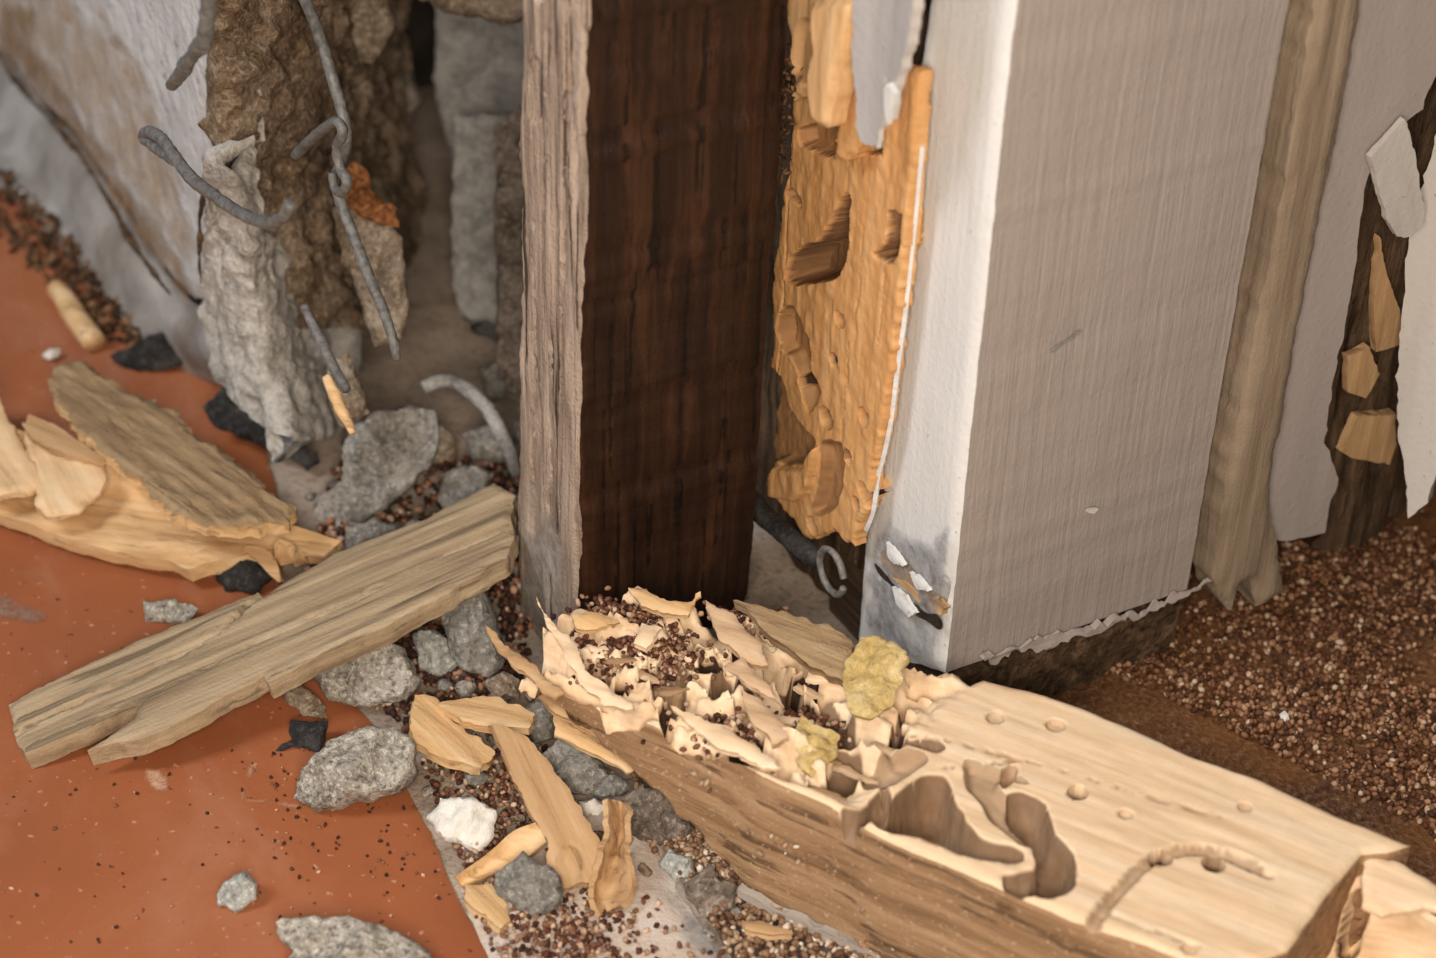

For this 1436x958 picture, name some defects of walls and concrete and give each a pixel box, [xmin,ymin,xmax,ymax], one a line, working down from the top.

peeling [851,0,924,149]
spalling [197,0,429,463]
peeling [1366,117,1425,238]